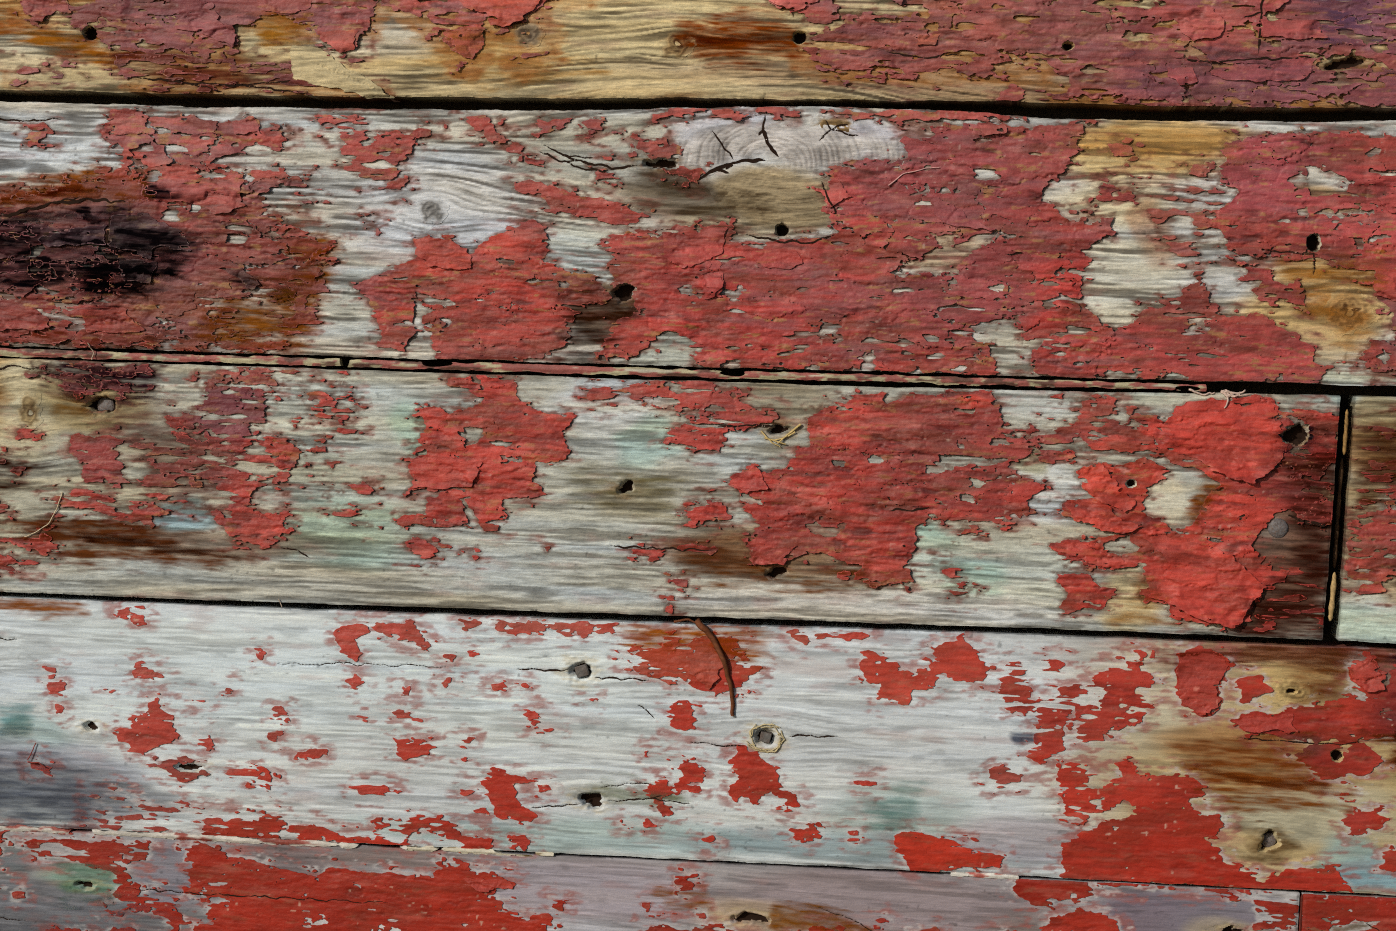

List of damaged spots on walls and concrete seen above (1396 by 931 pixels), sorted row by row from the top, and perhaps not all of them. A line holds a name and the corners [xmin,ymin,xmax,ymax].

rust [676,15,798,64]
crack [539,145,636,173]
crack [699,117,779,180]
crack [820,121,858,140]
water stain [143,184,178,199]
water stain [0,206,196,294]
peeling [0,0,552,549]
peeling [351,0,1396,931]
peeling [333,619,438,662]
peeling [112,693,180,755]
rust [1188,749,1328,809]
peeling [0,784,563,931]